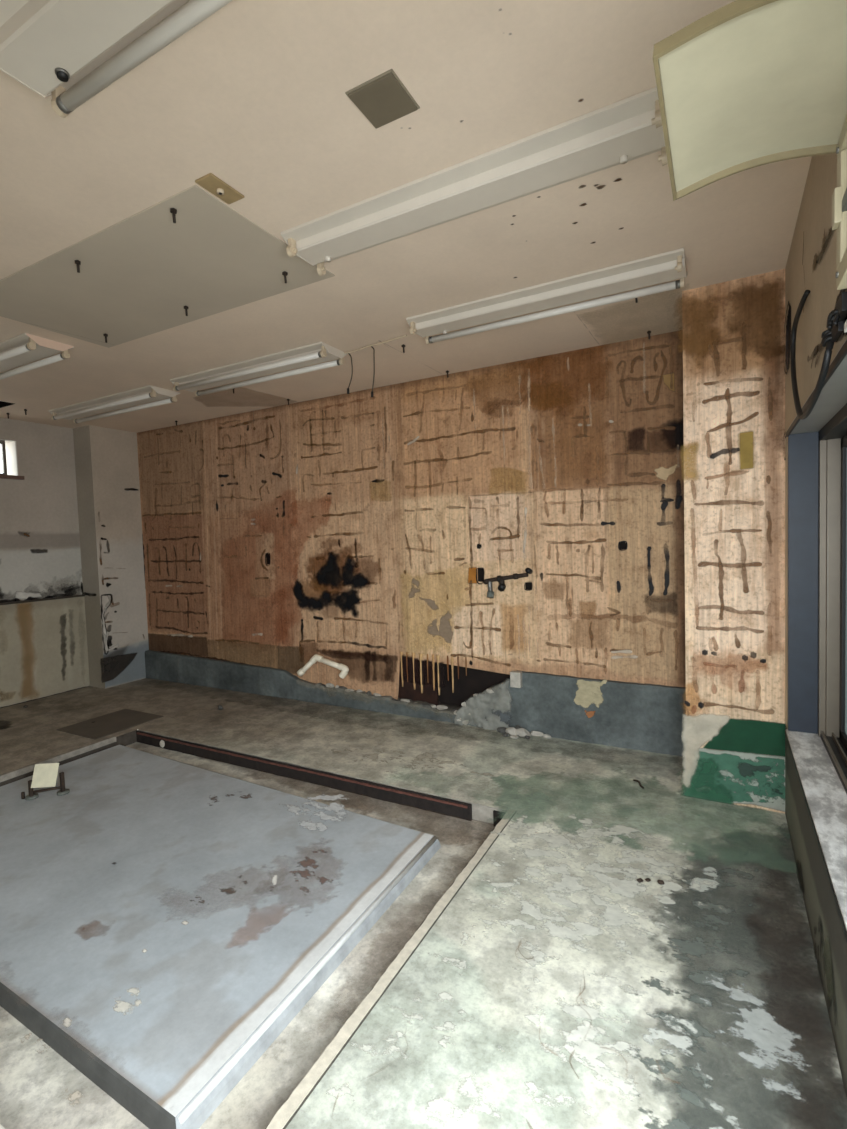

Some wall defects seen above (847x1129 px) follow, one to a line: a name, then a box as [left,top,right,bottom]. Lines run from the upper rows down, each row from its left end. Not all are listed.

peeling [813,227,833,271]
water stain [617,283,783,411]
water stain [180,407,472,512]
water stain [100,482,501,695]
water stain [561,521,615,550]
water stain [646,546,677,613]
water stain [692,514,772,663]
water stain [60,615,73,676]
spalling [321,680,512,731]
peeling [574,680,607,718]
peeling [682,714,785,812]
peeling [706,977,811,1099]